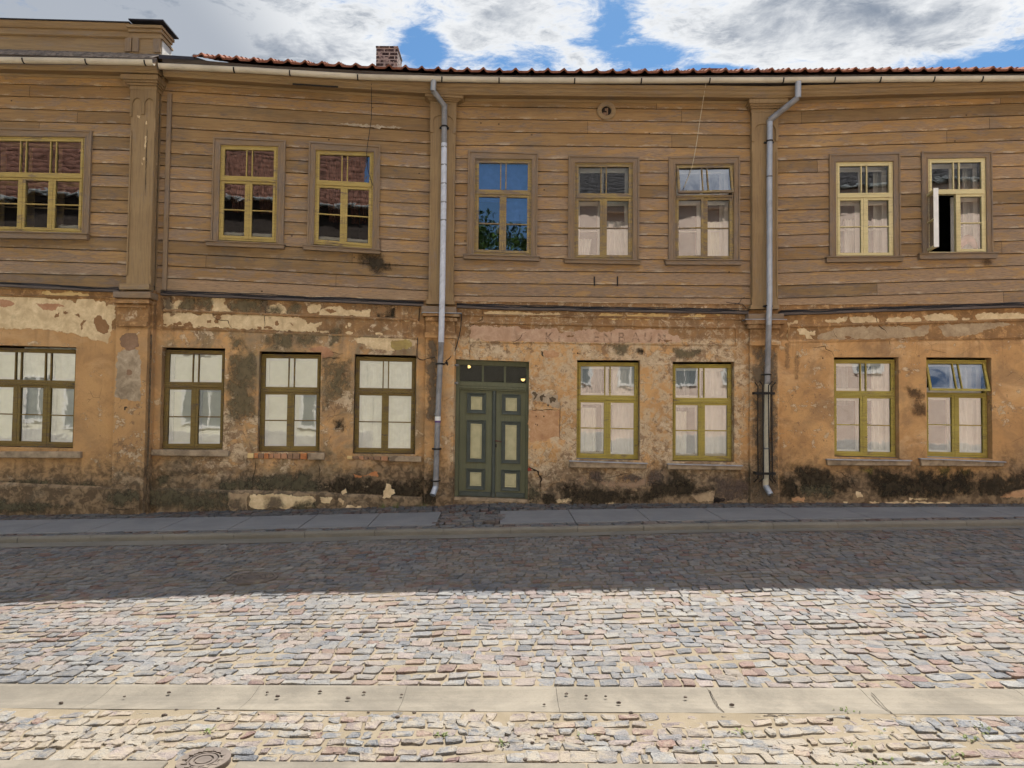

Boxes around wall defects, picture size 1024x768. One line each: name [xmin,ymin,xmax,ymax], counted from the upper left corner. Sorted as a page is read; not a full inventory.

peeling [163,298,412,351]
peeling [786,312,1024,340]
peeling [0,290,141,401]
water stain [266,334,316,348]
water stain [227,337,257,420]
water stain [529,343,1024,505]
water stain [219,477,254,490]
spalling [227,485,361,511]
spalling [354,471,395,499]
water stain [323,477,436,505]